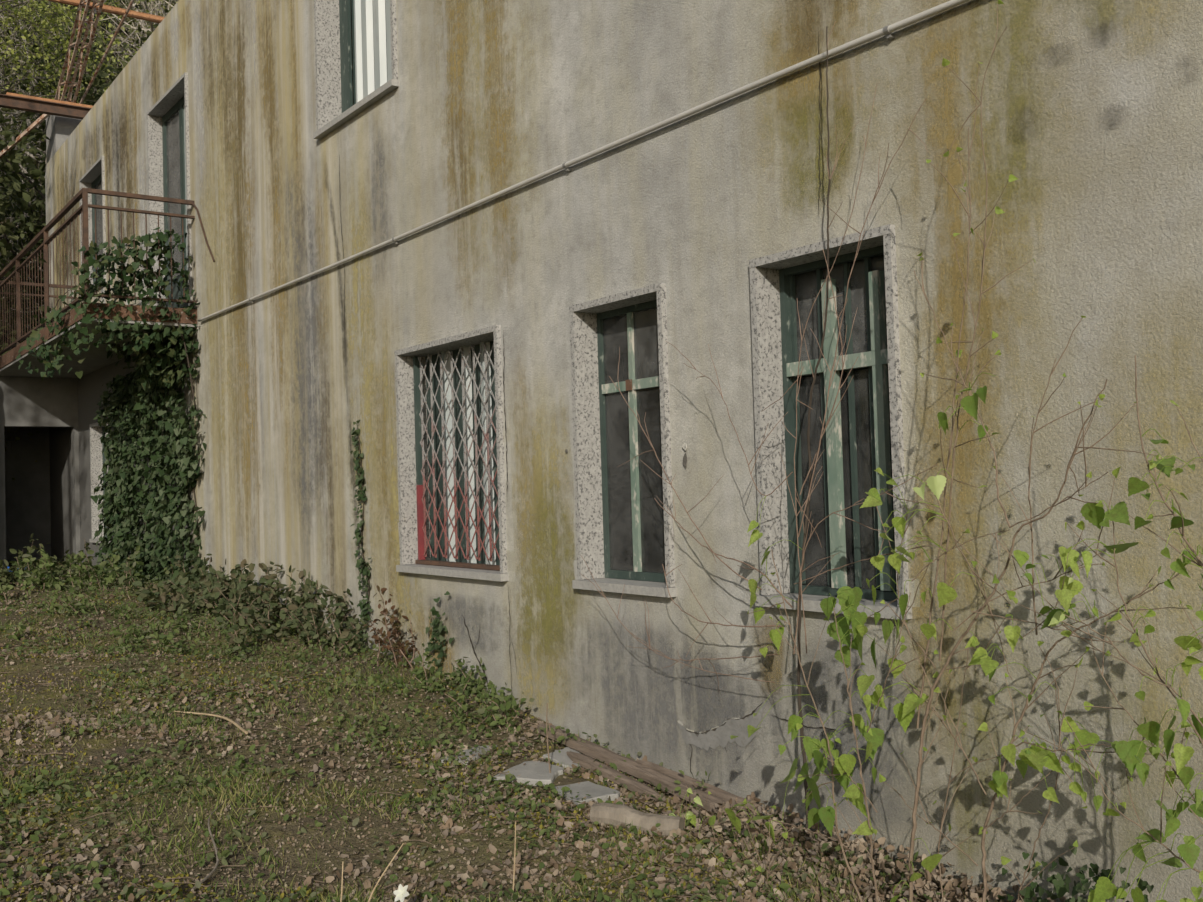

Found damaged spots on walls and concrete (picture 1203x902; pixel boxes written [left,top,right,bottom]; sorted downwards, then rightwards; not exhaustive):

leakage [85,84,145,249]
leakage [152,0,420,626]
leakage [517,431,571,709]